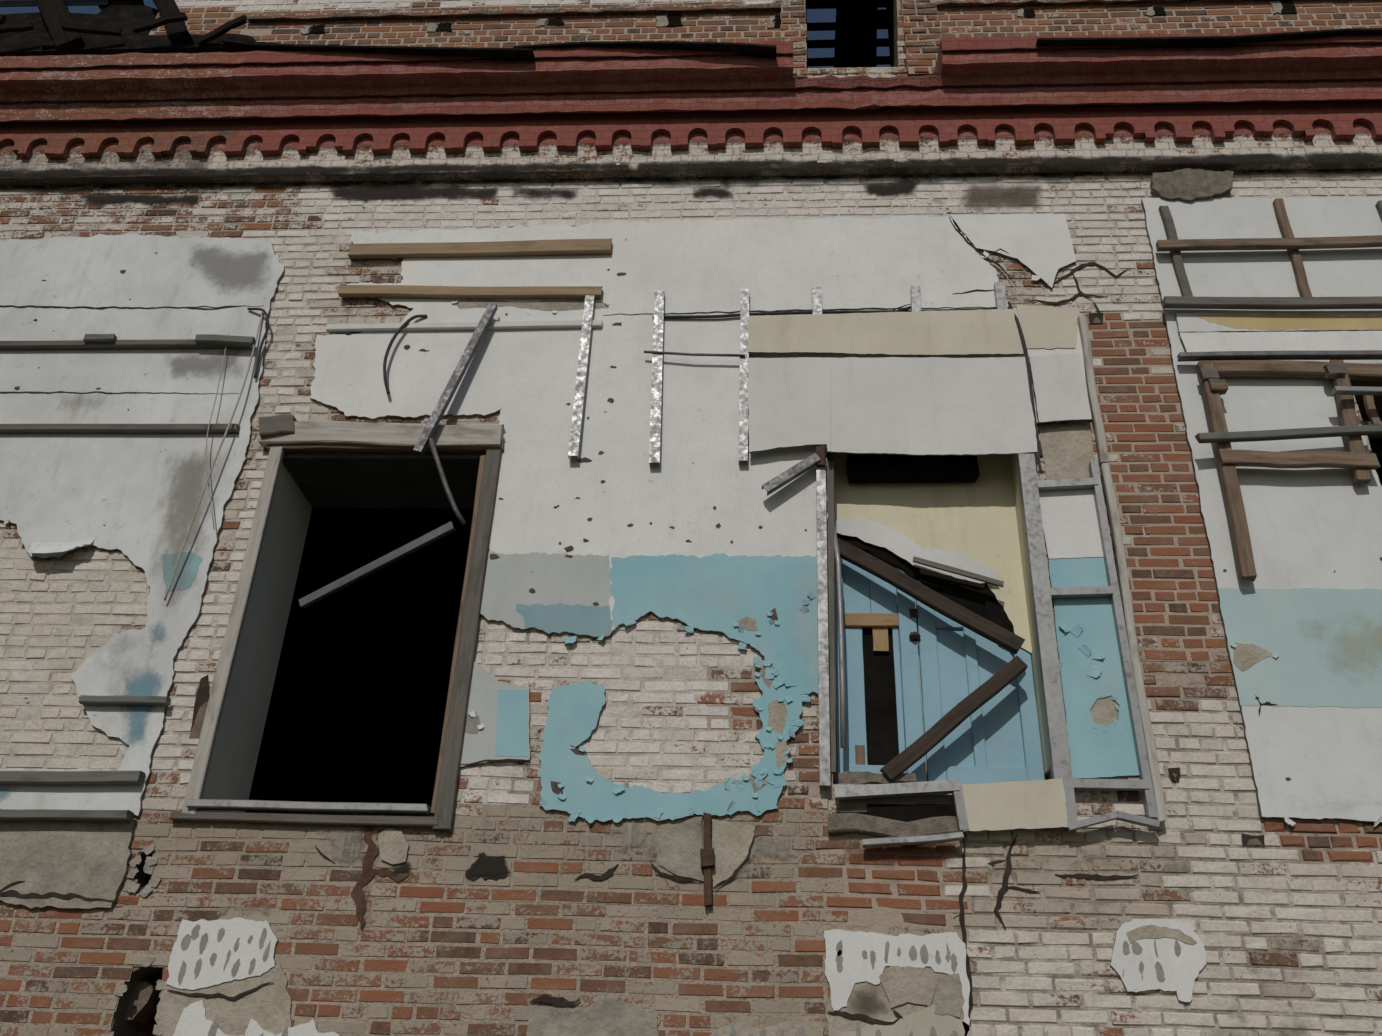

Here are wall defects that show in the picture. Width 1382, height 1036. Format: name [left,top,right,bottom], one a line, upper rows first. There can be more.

crack [612,217,1131,316]
spalling [980,251,1046,304]
spalling [0,519,149,769]
spalling [189,675,209,738]
spalling [465,711,484,734]
spalling [475,608,832,819]
spalling [458,755,594,824]
spalling [126,842,161,898]
crack [315,826,409,929]
peeling [100,917,340,1036]
crack [954,834,1139,1027]